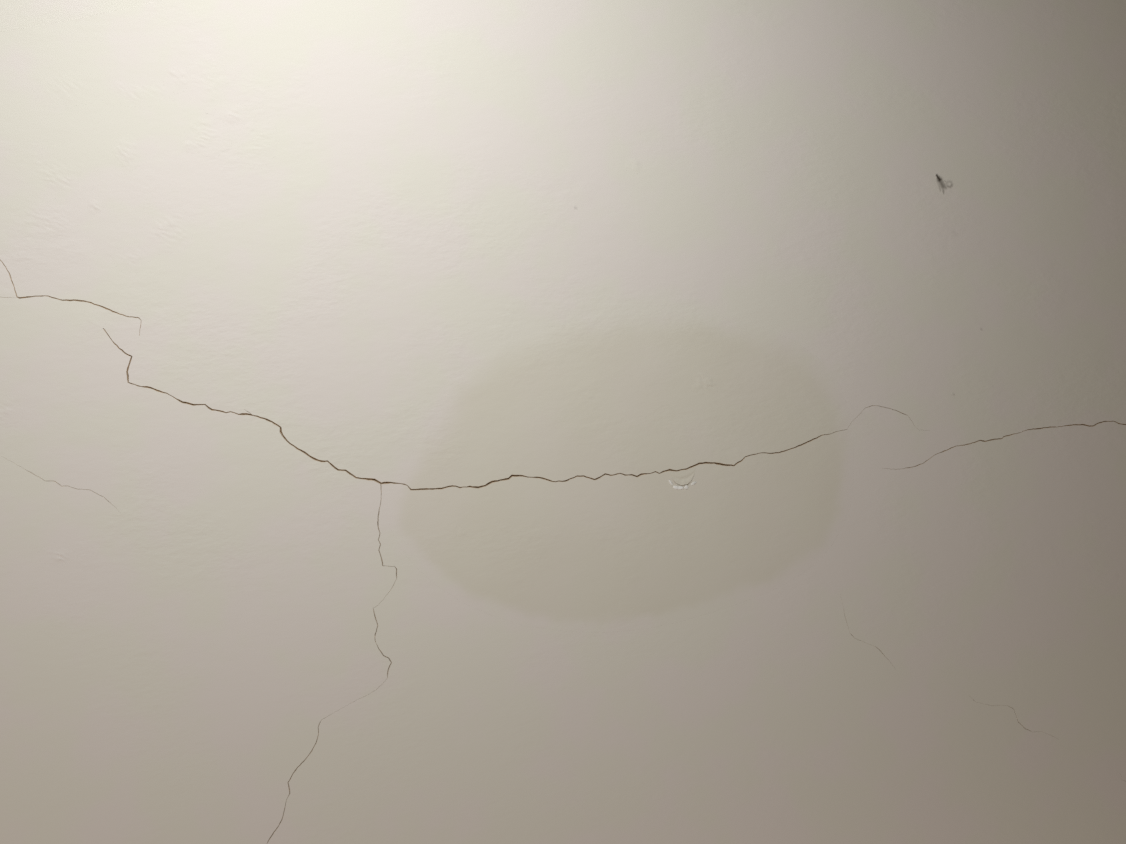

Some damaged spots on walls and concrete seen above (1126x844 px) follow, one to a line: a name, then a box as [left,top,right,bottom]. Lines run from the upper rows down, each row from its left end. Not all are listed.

crack [0,260,919,843]
damp [388,312,854,632]
crack [885,421,1126,469]